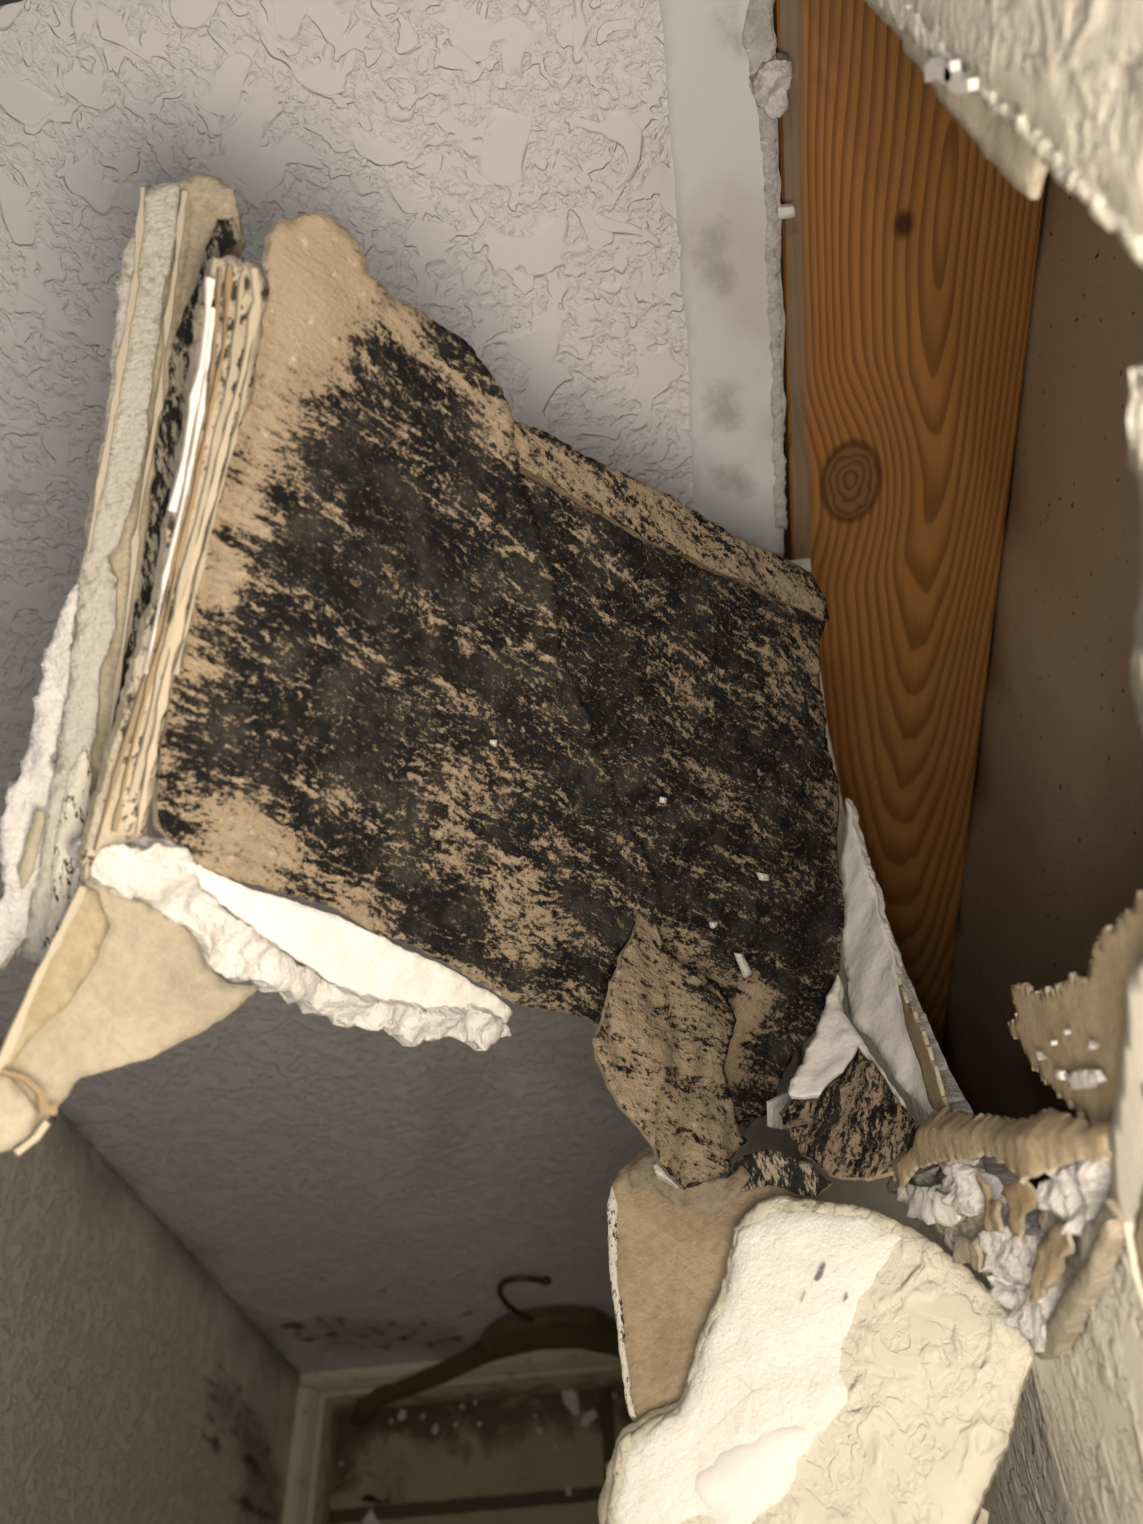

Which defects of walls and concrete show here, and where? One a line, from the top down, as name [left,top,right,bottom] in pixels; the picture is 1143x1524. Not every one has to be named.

crack [0,0,22,8]
spalling [742,0,796,530]
spalling [873,0,1143,267]
spalling [66,836,512,1051]
leakage [726,1149,833,1200]
peeling [1035,959,1143,1360]
peeling [561,1390,597,1428]
flaking render [614,1210,902,1524]